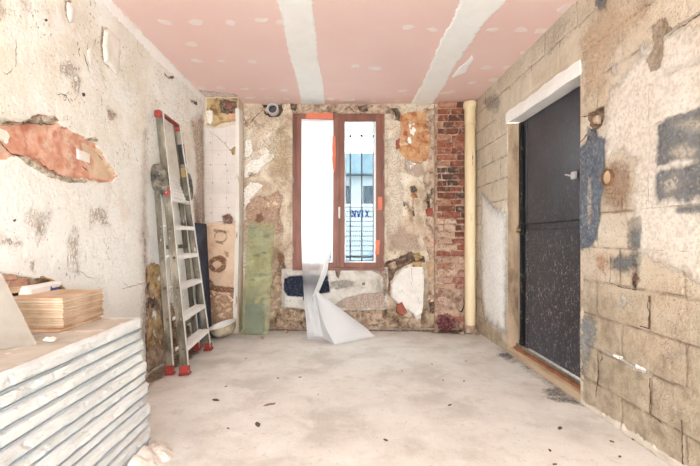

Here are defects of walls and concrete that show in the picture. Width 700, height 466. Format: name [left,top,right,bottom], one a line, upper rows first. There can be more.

peeling [65,0,76,22]
peeling [101,27,120,74]
flaking render [0,114,117,183]
peeling [579,19,700,281]
flaking render [243,139,284,235]
flaking render [262,103,434,329]
flaking render [245,264,307,329]